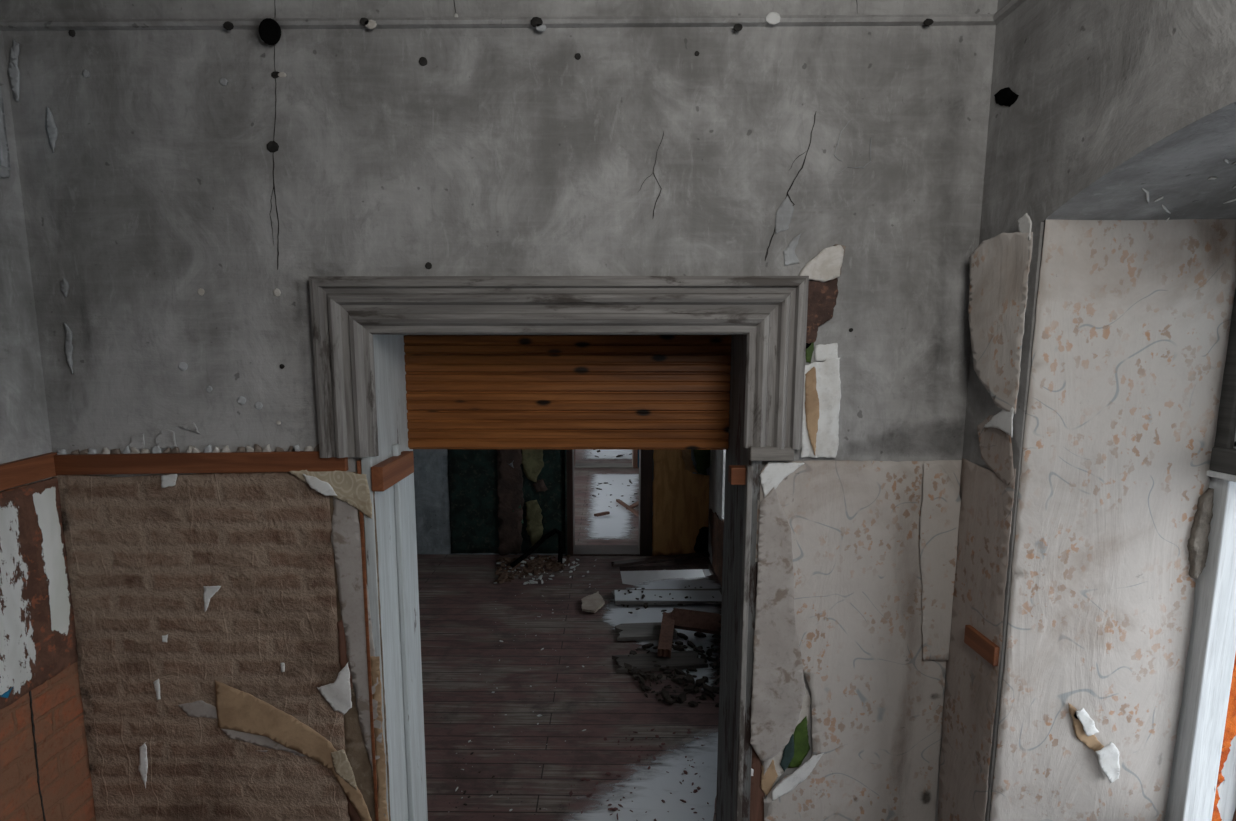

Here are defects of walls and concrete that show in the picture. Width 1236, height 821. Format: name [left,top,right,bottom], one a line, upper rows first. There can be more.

crack [765,112,816,265]
flaking render [798,244,846,458]
flaking render [57,423,319,455]
flaking render [0,472,350,821]
flaking render [762,747,785,796]